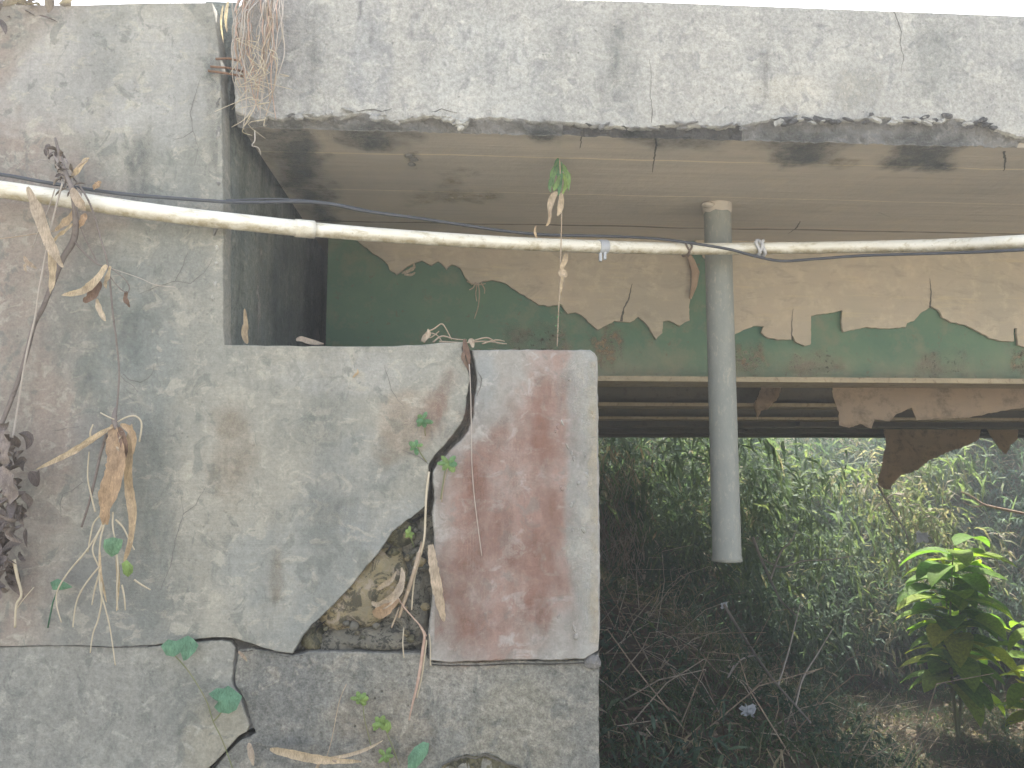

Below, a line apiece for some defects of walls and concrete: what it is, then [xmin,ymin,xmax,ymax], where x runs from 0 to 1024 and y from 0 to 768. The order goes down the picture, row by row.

spalling [235,107,1021,148]
crack [649,61,658,172]
peeling [356,237,705,340]
peeling [732,241,1024,347]
crack [401,348,482,516]
crack [4,642,160,650]
crack [195,637,303,768]